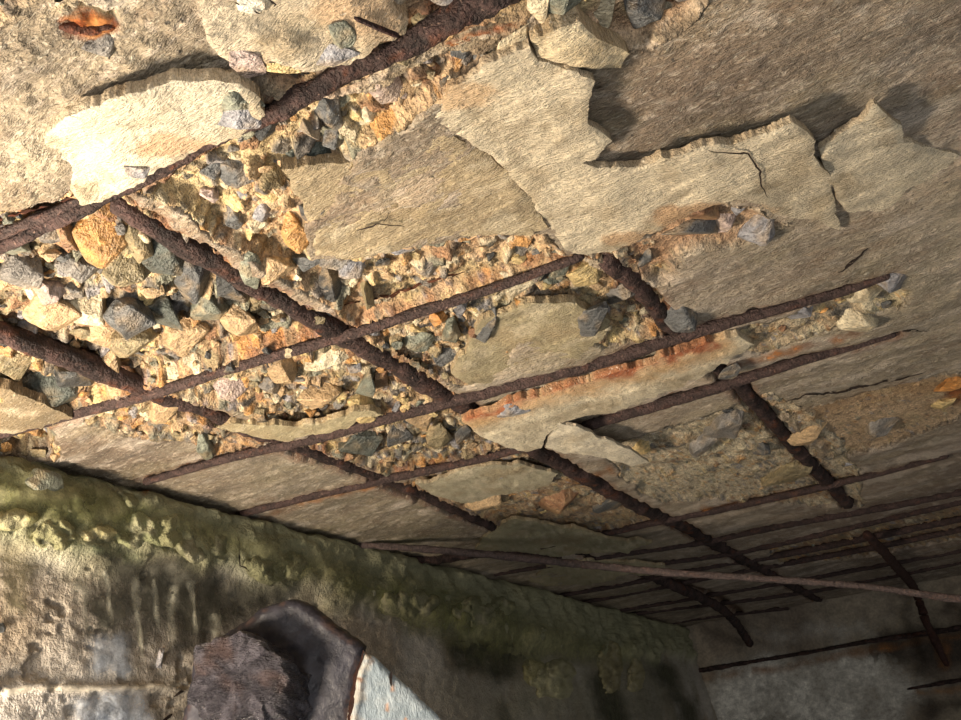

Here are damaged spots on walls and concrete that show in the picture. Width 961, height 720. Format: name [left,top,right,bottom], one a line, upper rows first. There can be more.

rust [68,12,110,37]
crack [708,150,768,198]
peeling [0,0,961,563]
water stain [2,550,26,611]
water stain [85,556,284,646]
water stain [0,687,31,695]
water stain [43,684,175,692]